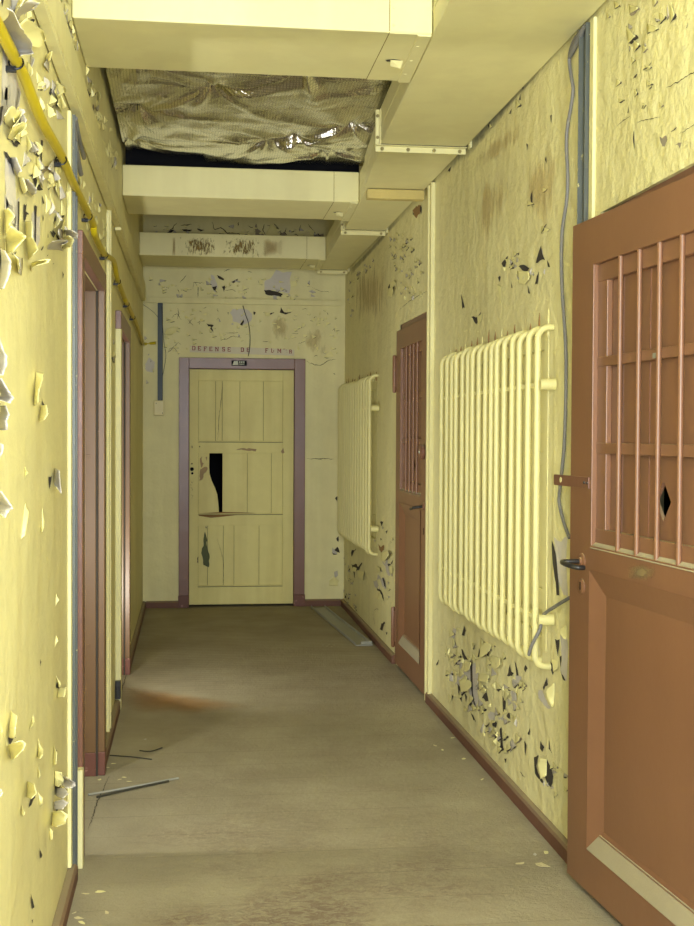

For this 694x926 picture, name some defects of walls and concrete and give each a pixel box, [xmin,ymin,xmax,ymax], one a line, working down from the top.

peeling [607,0,677,113]
peeling [0,0,107,289]
peeling [149,269,339,356]
peeling [0,340,14,430]
peeling [34,372,49,421]
peeling [0,491,13,518]
peeling [21,502,30,539]
peeling [329,521,393,611]
peeling [552,537,568,597]
peeling [0,710,26,760]
peeling [436,626,568,797]
peeling [21,739,76,840]